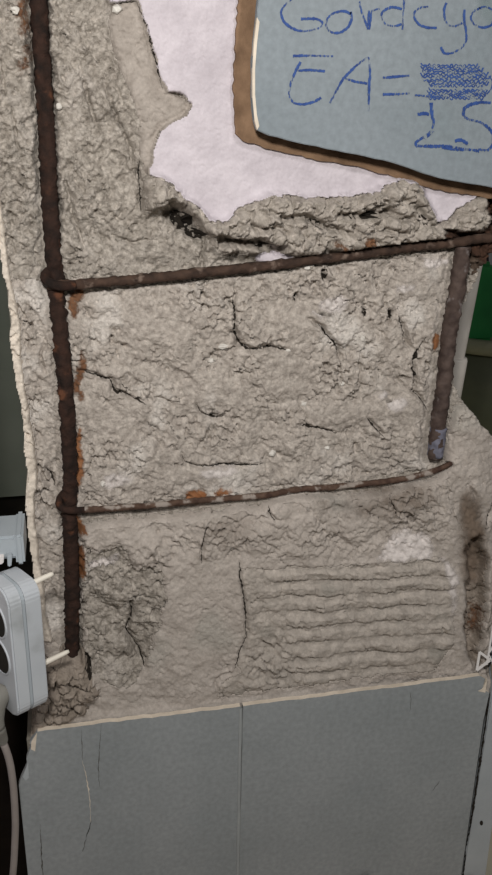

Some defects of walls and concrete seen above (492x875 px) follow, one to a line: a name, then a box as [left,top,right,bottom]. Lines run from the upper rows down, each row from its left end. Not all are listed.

rust [17,0,29,34]
rust [68,289,84,319]
spalling [0,0,492,693]
crack [231,300,286,350]
rust [73,350,87,401]
rust [76,429,84,486]
crack [182,456,263,467]
rust [186,488,230,499]
rust [76,515,88,578]
crack [235,562,247,668]
crack [81,730,101,849]